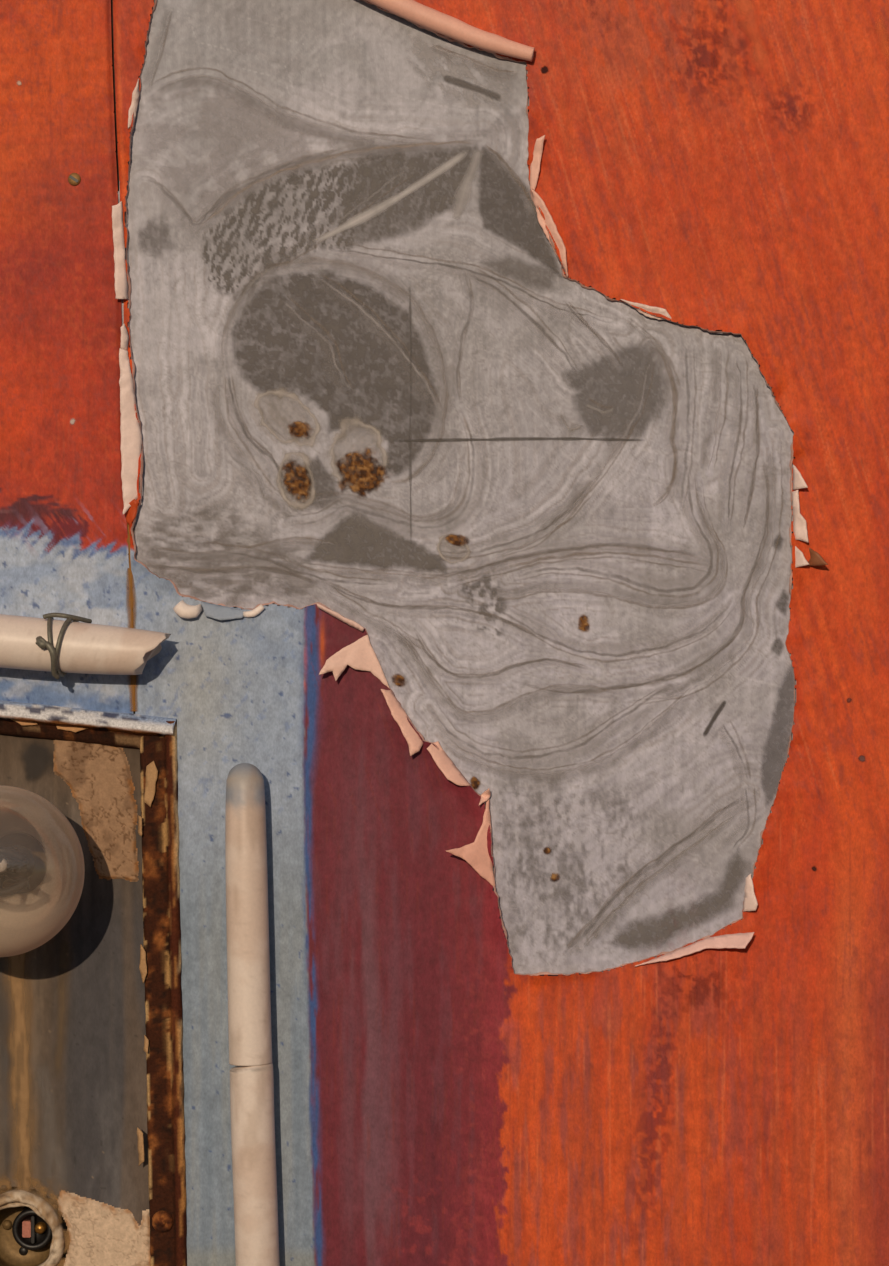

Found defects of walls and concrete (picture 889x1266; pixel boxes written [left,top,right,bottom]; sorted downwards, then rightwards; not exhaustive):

corrosion [254,389,320,509]
corrosion [330,419,387,496]
peeling [112,0,828,976]
corrosion [437,534,470,563]
peeling [53,725,158,882]
peeling [139,944,147,983]
peeling [137,1127,145,1166]
peeling [58,1190,150,1266]